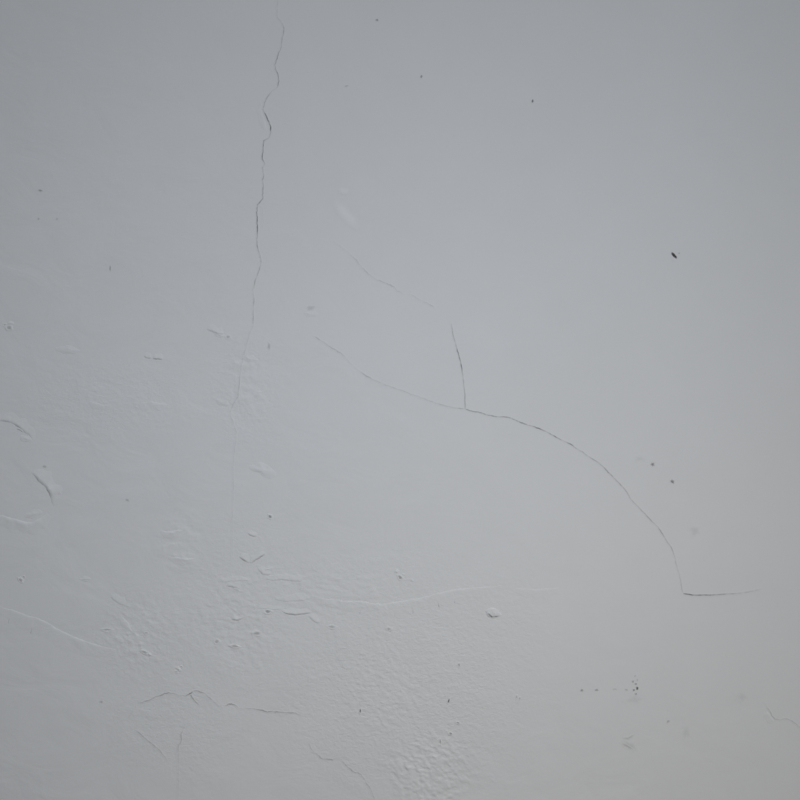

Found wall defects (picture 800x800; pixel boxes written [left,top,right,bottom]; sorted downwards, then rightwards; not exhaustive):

crack [228,0,286,566]
crack [313,321,762,597]
crack [126,689,302,800]